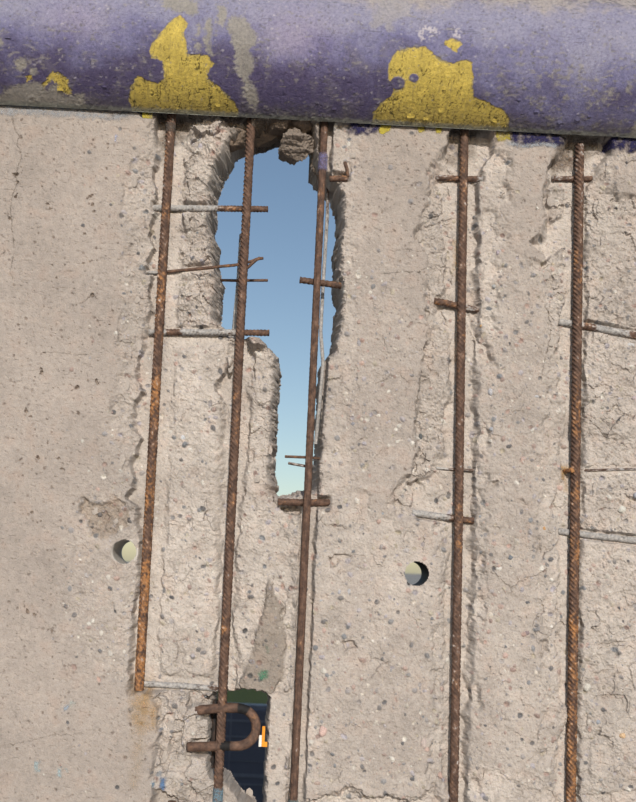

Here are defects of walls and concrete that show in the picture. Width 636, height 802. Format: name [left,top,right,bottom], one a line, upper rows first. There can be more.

peeling [0,56,88,109]
spalling [57,0,260,802]
spalling [227,25,636,802]